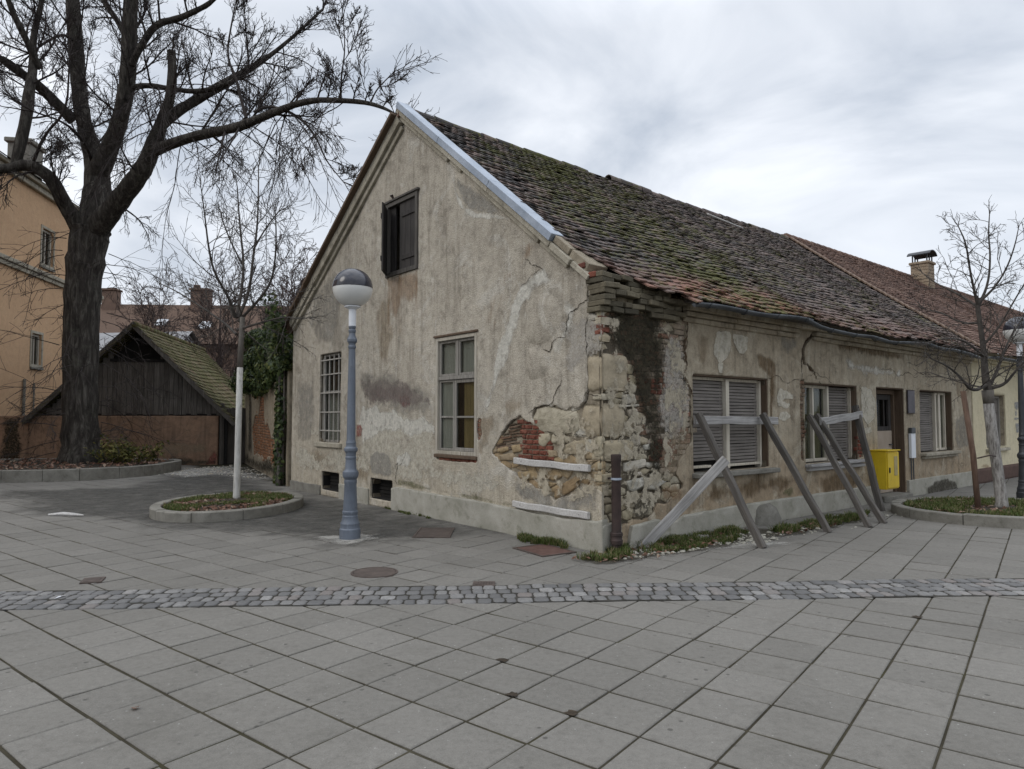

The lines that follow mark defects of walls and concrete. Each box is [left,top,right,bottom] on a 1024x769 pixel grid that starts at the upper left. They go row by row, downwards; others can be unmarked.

crack [545,290,588,352]
peeling [713,331,748,373]
crack [769,335,853,392]
flaking render [252,396,275,463]
crack [528,374,596,439]
flaking render [493,297,697,523]
peeling [777,379,806,460]